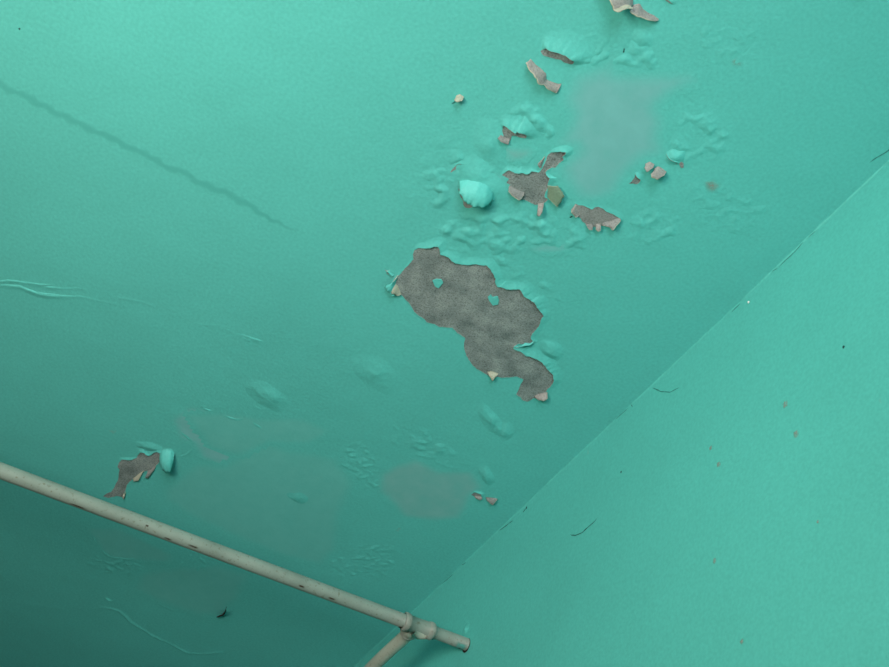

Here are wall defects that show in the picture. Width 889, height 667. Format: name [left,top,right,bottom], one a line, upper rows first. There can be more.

peeling [609,0,662,22]
peeling [451,24,709,232]
peeling [385,237,564,403]
peeling [103,441,175,499]